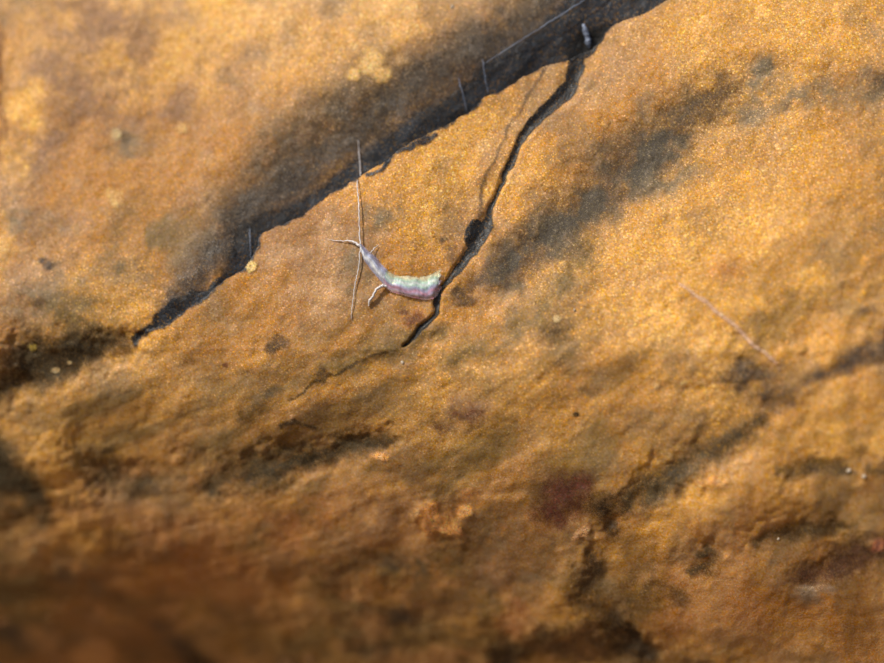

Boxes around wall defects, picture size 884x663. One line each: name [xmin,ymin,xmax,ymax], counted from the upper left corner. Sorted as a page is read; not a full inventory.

crack [131,0,667,429]
leakage [454,85,737,305]
leakage [0,331,130,399]